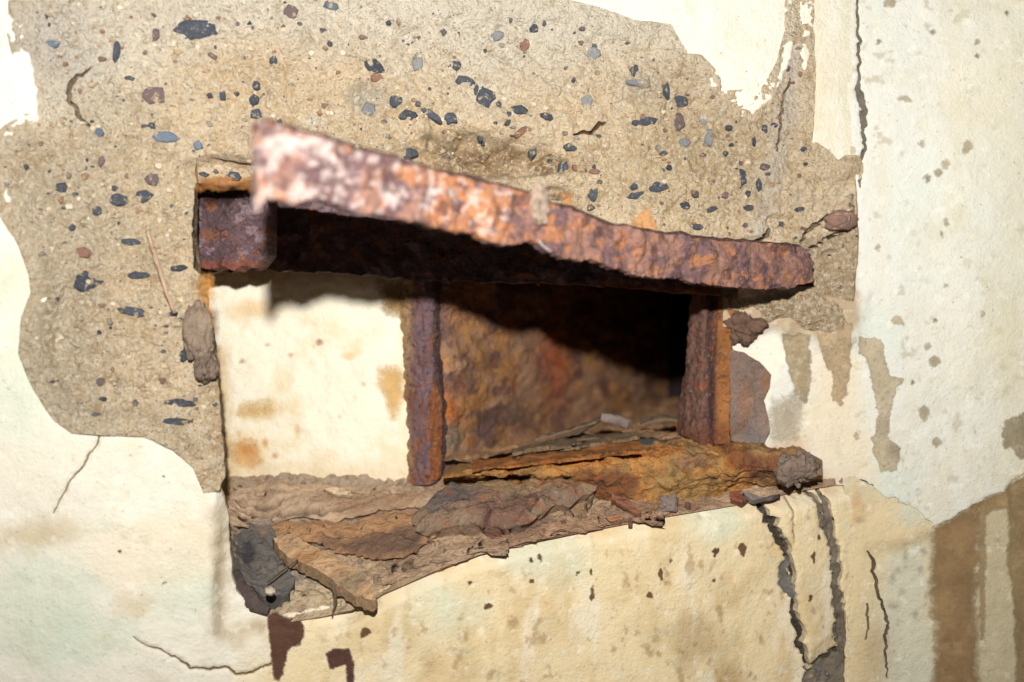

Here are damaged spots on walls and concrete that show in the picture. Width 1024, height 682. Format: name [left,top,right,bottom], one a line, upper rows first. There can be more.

crack [67,75,90,127]
crack [854,0,867,188]
corrosion [197,177,252,190]
spalling [0,0,863,493]
corrosion [634,210,656,230]
peeling [772,323,914,472]
crack [53,435,101,513]
peeling [729,490,780,507]
peeling [233,569,270,616]
crack [756,488,889,676]
leakage [930,479,1024,682]
crack [136,638,272,675]